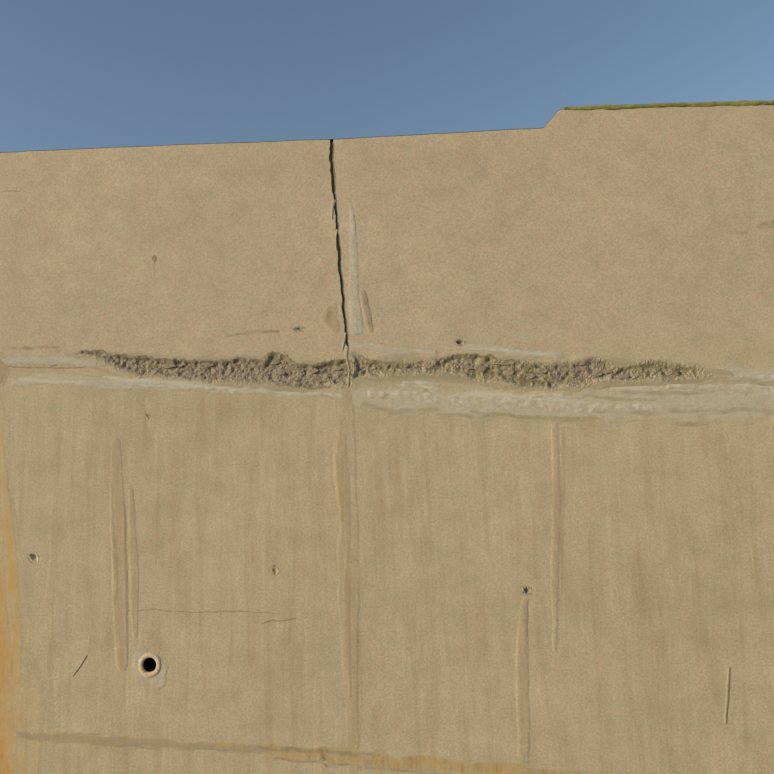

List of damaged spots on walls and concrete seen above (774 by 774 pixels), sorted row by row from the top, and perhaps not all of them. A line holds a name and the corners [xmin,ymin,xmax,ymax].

crack [329,141,351,387]
spalling [76,338,714,391]
damp [0,343,774,774]